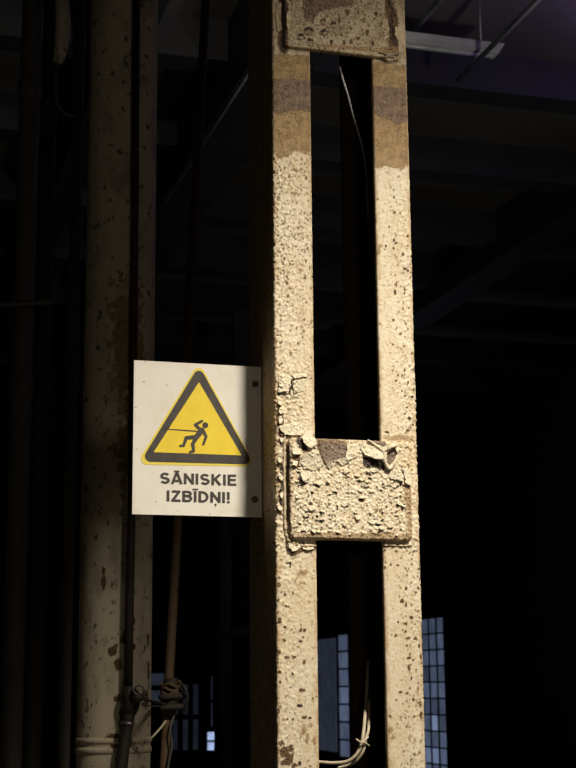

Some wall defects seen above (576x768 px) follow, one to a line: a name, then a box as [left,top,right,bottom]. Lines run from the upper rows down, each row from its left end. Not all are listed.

crack [277,373,308,398]
peeling [276,401,413,536]